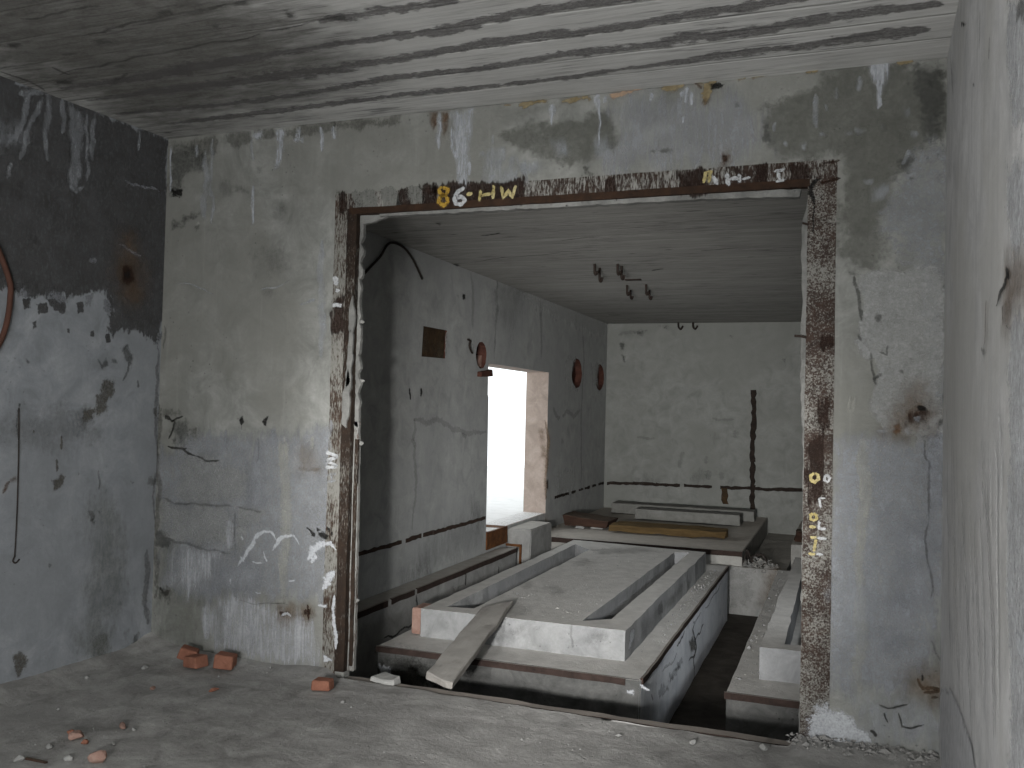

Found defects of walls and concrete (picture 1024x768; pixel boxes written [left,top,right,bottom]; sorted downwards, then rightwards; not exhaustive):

rust [339,190,347,215]
water stain [436,109,473,184]
rust [396,175,528,207]
rust [676,166,708,198]
rust [753,163,767,191]
rust [789,163,809,188]
water stain [766,63,947,266]
peeling [0,76,168,422]
rust [329,294,345,335]
spalling [53,436,64,489]
crack [165,415,219,462]
rust [804,396,830,506]